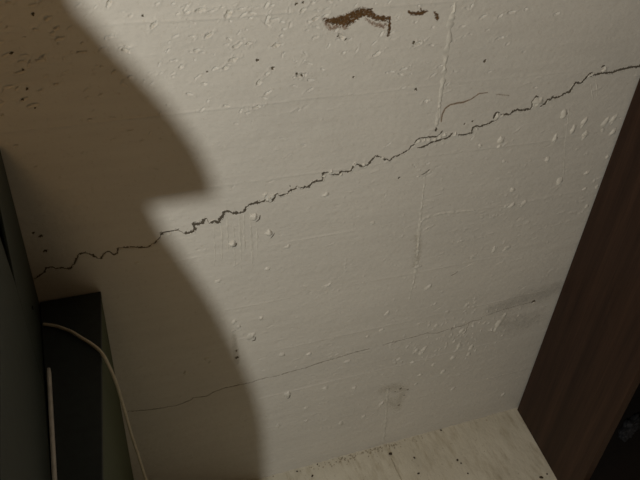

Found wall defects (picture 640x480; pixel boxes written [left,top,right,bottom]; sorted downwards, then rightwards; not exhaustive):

rust [323,8,391,37]
crack [33,64,640,280]